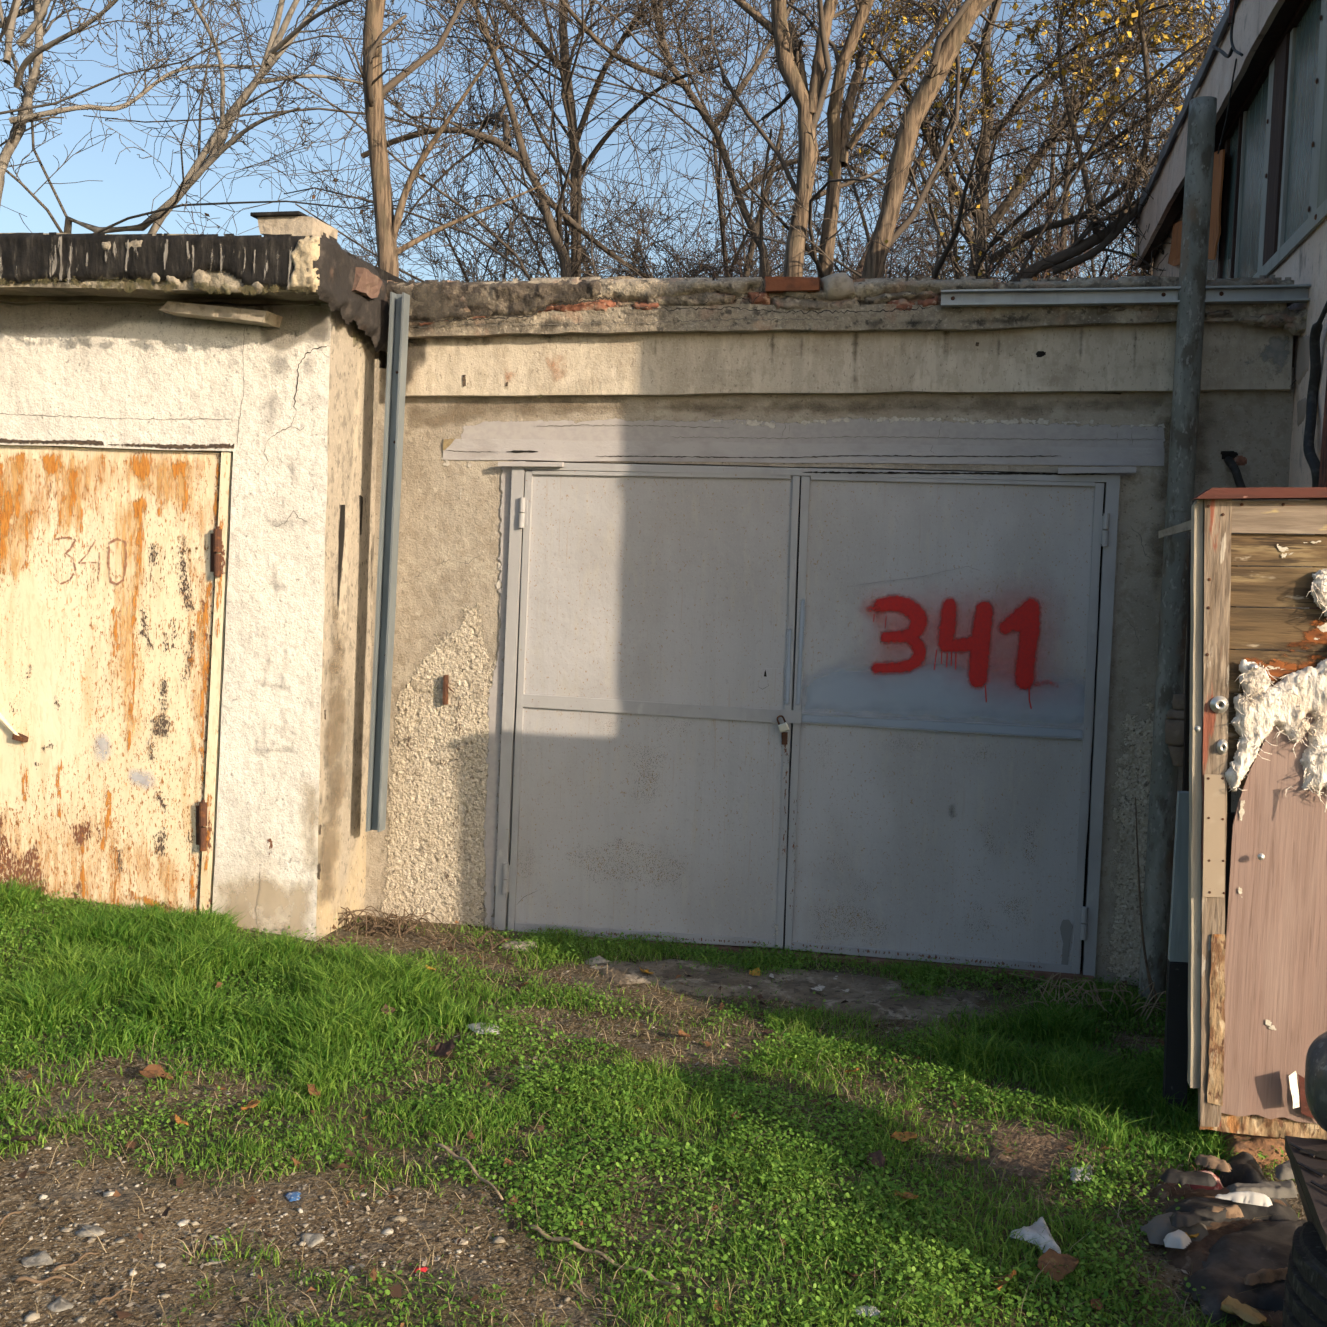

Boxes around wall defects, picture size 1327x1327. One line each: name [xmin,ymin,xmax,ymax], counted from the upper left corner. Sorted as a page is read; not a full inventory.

spalling [286,236,320,292]
spalling [538,291,941,313]
crack [0,324,327,461]
corrosion [0,452,225,914]
spalling [378,600,497,926]